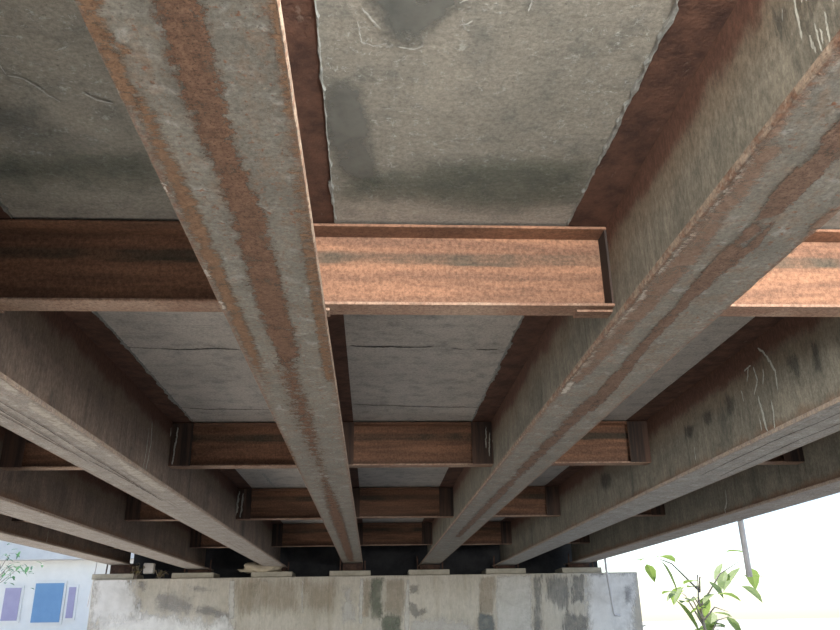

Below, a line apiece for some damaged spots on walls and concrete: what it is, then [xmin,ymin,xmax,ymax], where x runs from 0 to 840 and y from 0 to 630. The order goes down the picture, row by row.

water stain [372,0,456,43]
water stain [794,0,830,53]
rust [74,0,354,562]
crack [350,342,425,350]
rust [456,121,840,537]
rust [0,401,161,500]
water stain [343,578,467,630]
water stain [478,573,636,630]